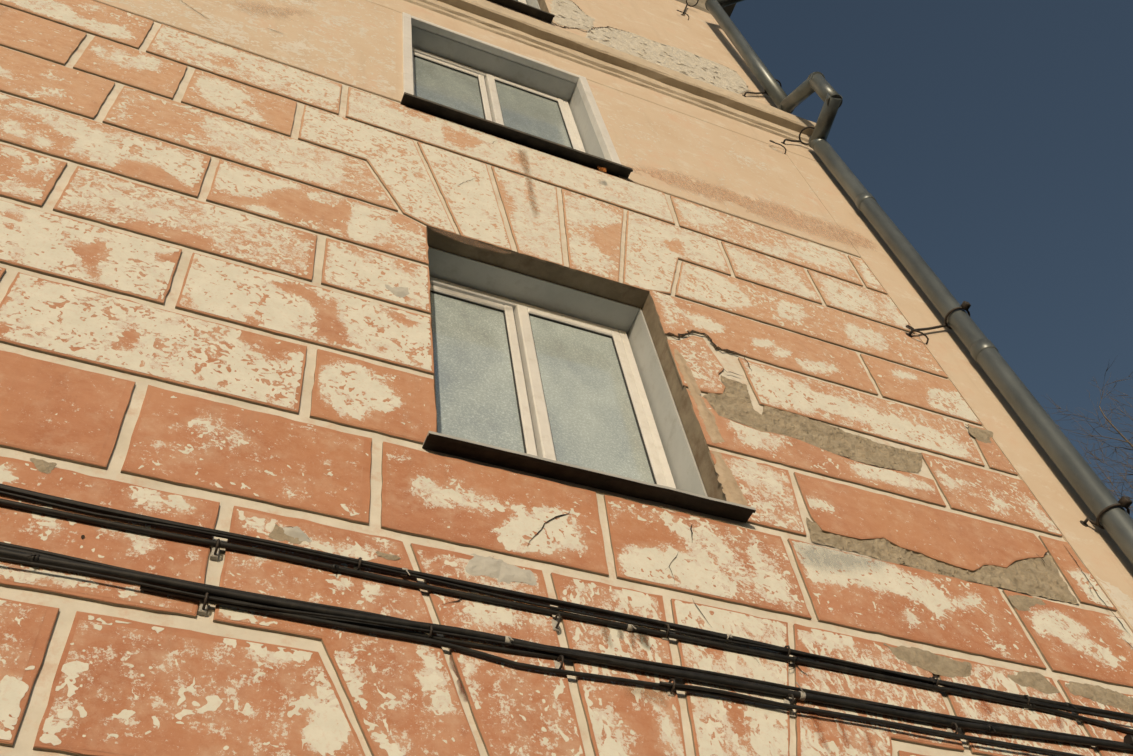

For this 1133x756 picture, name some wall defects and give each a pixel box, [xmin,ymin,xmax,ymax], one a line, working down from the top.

peeling [0,0,1061,534]
crack [666,330,752,376]
peeling [0,600,46,740]
peeling [0,560,194,612]
peeling [0,351,214,582]
peeling [39,615,363,756]
peeling [218,509,583,756]
crack [528,513,569,545]
peeling [556,577,684,756]
peeling [674,600,788,756]
peeling [711,451,1133,685]
peeling [797,629,1133,756]